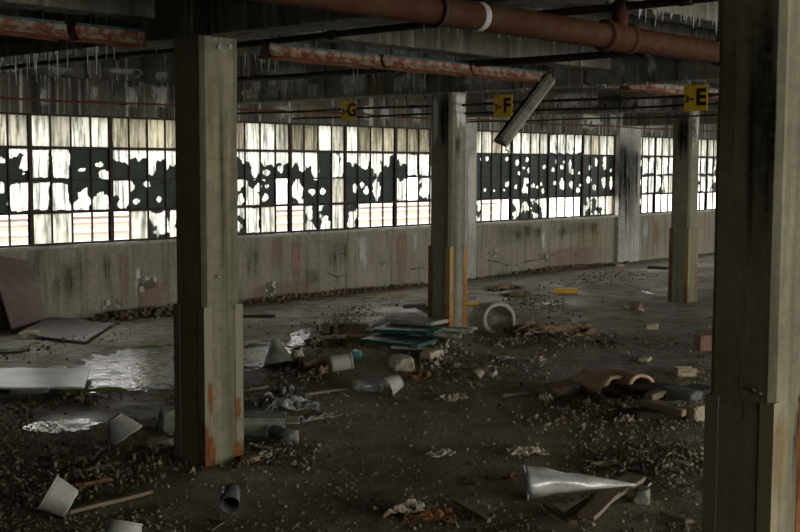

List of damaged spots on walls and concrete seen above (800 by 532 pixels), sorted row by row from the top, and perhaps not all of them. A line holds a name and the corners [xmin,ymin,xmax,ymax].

water stain [619,142,638,215]